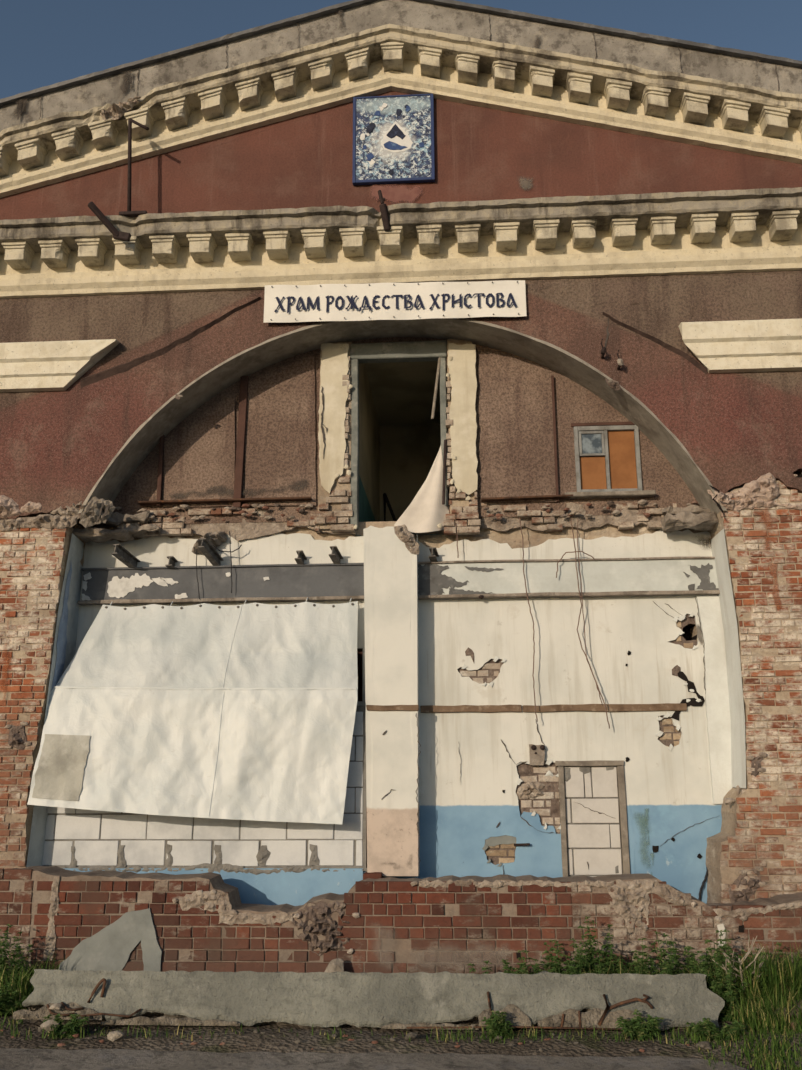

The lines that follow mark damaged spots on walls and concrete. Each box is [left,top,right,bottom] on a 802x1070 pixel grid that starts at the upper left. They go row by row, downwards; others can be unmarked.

spalling [314,344,357,532]
spalling [437,350,481,535]
spalling [0,501,88,531]
peeling [107,573,188,599]
peeling [394,524,503,595]
peeling [684,563,719,590]
hole [670,612,698,650]
spalling [457,647,506,687]
spalling [656,712,681,751]
spalling [502,758,561,834]
spalling [482,835,530,866]
spalling [172,890,360,956]